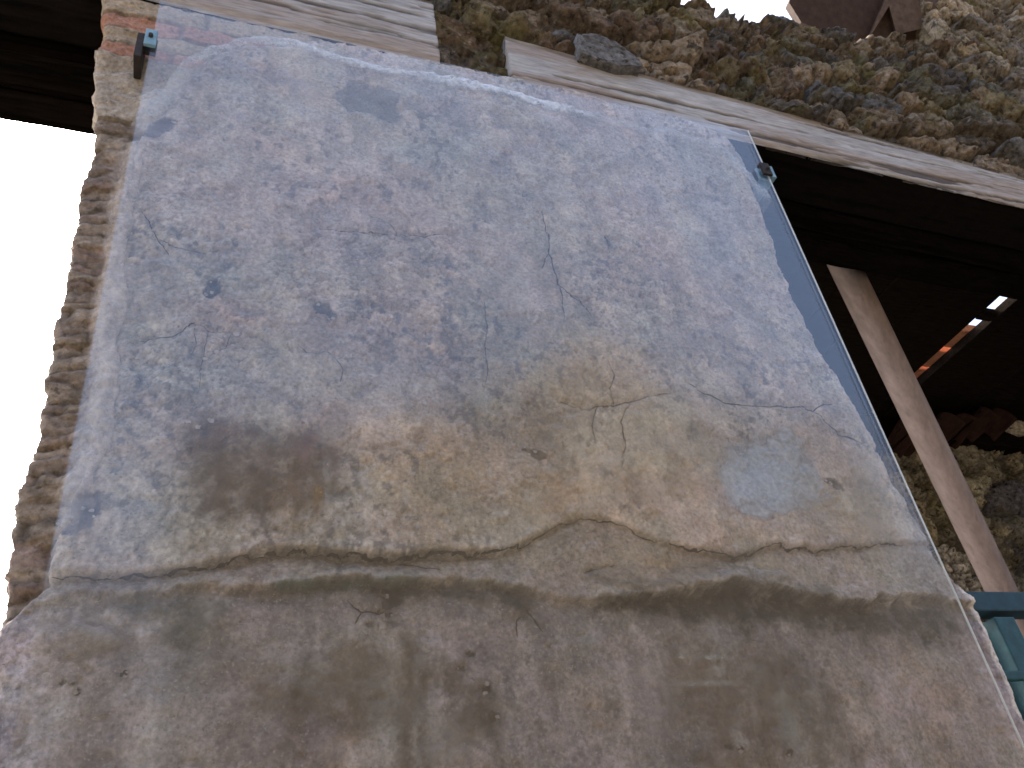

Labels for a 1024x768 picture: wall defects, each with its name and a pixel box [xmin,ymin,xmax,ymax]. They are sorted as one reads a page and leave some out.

crack [541,211,592,317]
crack [140,323,232,388]
crack [561,361,864,465]
water stain [186,420,332,518]
water stain [599,581,959,645]